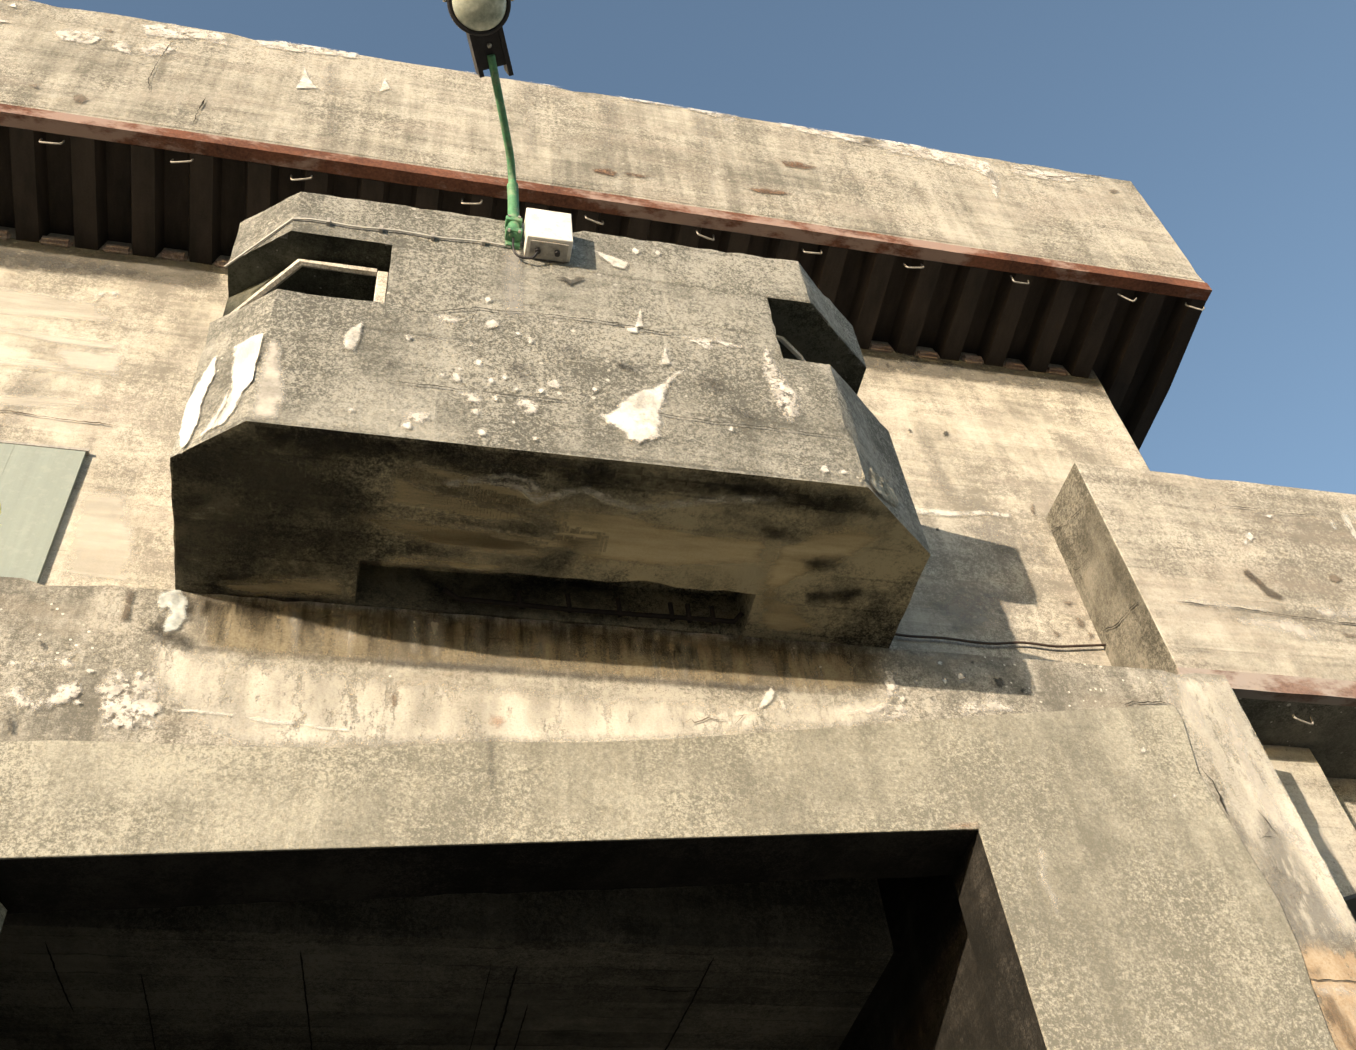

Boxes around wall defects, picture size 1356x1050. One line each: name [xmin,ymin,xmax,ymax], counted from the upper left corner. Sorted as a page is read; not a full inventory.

rust [593,169,645,177]
leakage [0,333,118,374]
leakage [518,400,537,412]
spalling [604,349,679,442]
leakage [172,343,481,567]
leakage [448,453,853,510]
leakage [808,590,861,603]
leakage [99,595,904,745]
leakage [10,682,80,708]
leakage [964,701,1010,712]
crack [641,957,714,1050]